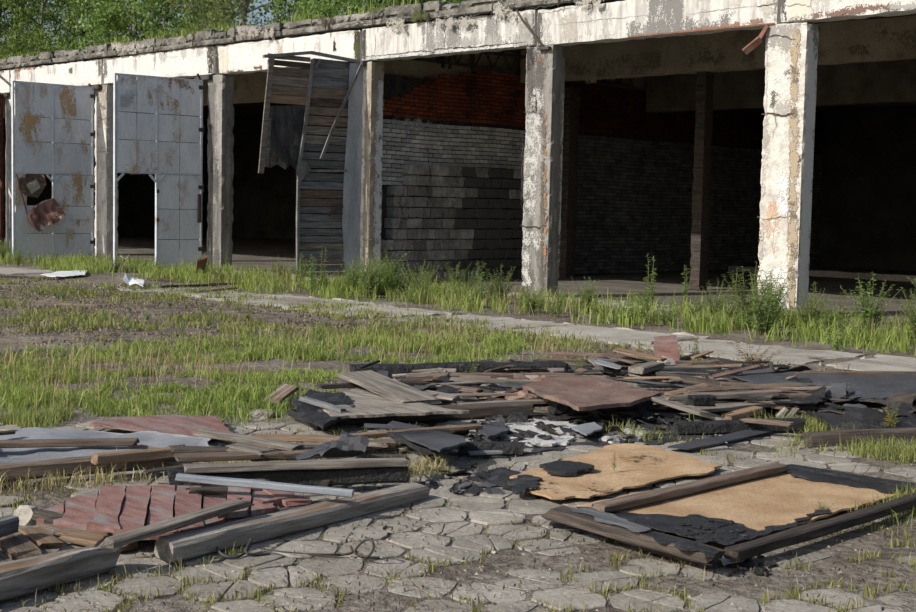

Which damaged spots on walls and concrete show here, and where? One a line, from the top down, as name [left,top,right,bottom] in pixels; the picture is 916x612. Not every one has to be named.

peeling [233,24,274,39]
peeling [385,17,405,33]
peeling [435,14,476,30]
spalling [493,1,514,22]
spalling [576,0,604,10]
rust [15,82,88,164]
rust [57,170,92,249]
rust [118,74,194,205]
peeling [522,89,546,293]
peeling [556,96,564,294]
spalling [754,0,916,313]